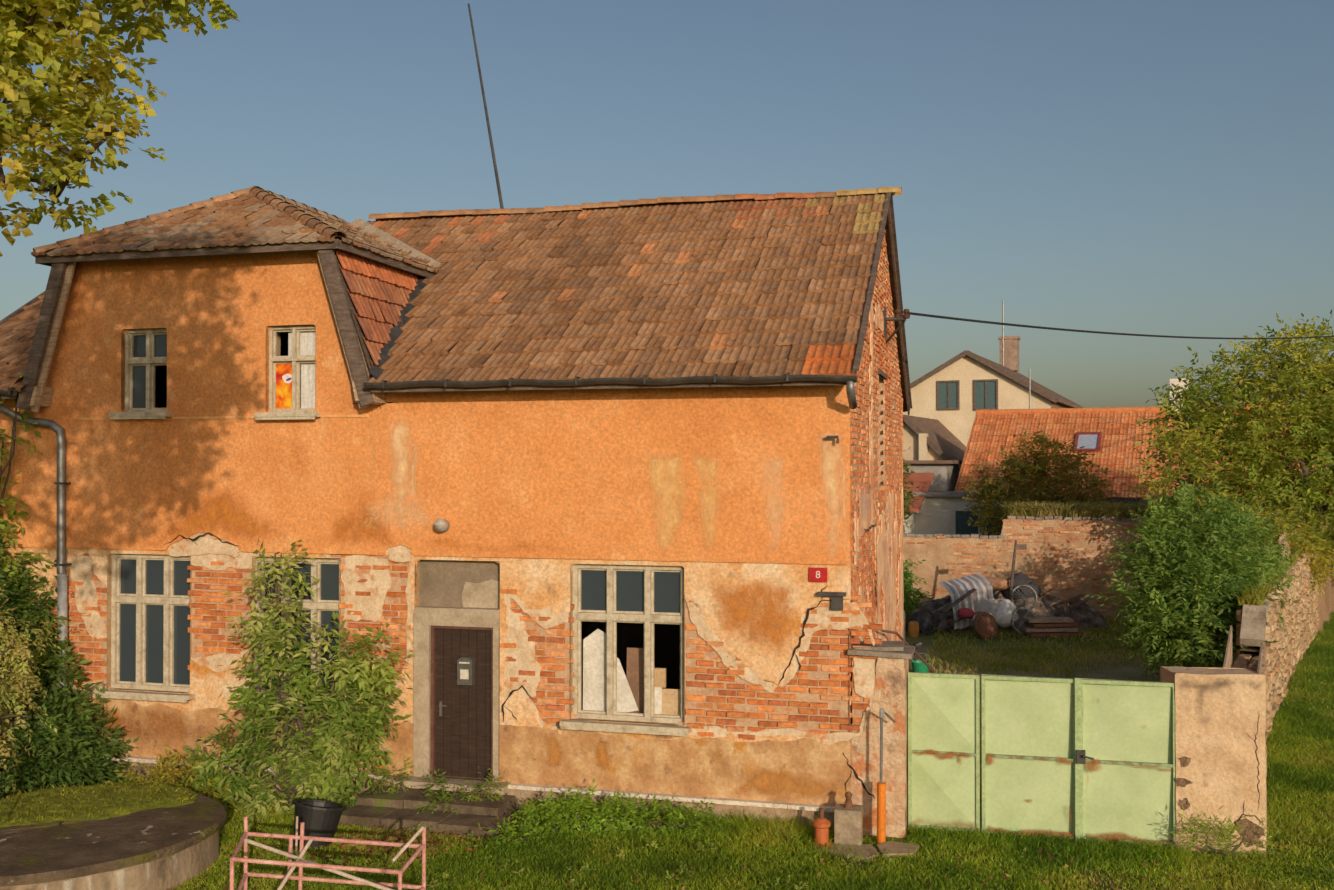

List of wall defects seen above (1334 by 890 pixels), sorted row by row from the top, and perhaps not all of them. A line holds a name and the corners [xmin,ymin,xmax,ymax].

flaking render [662,302,904,744]
flaking render [23,553,109,690]
flaking render [167,532,268,673]
flaking render [326,537,417,695]
flaking render [500,589,592,734]
damp [719,586,787,639]
crack [765,513,882,686]
rust [914,750,969,762]
rust [1059,759,1099,771]